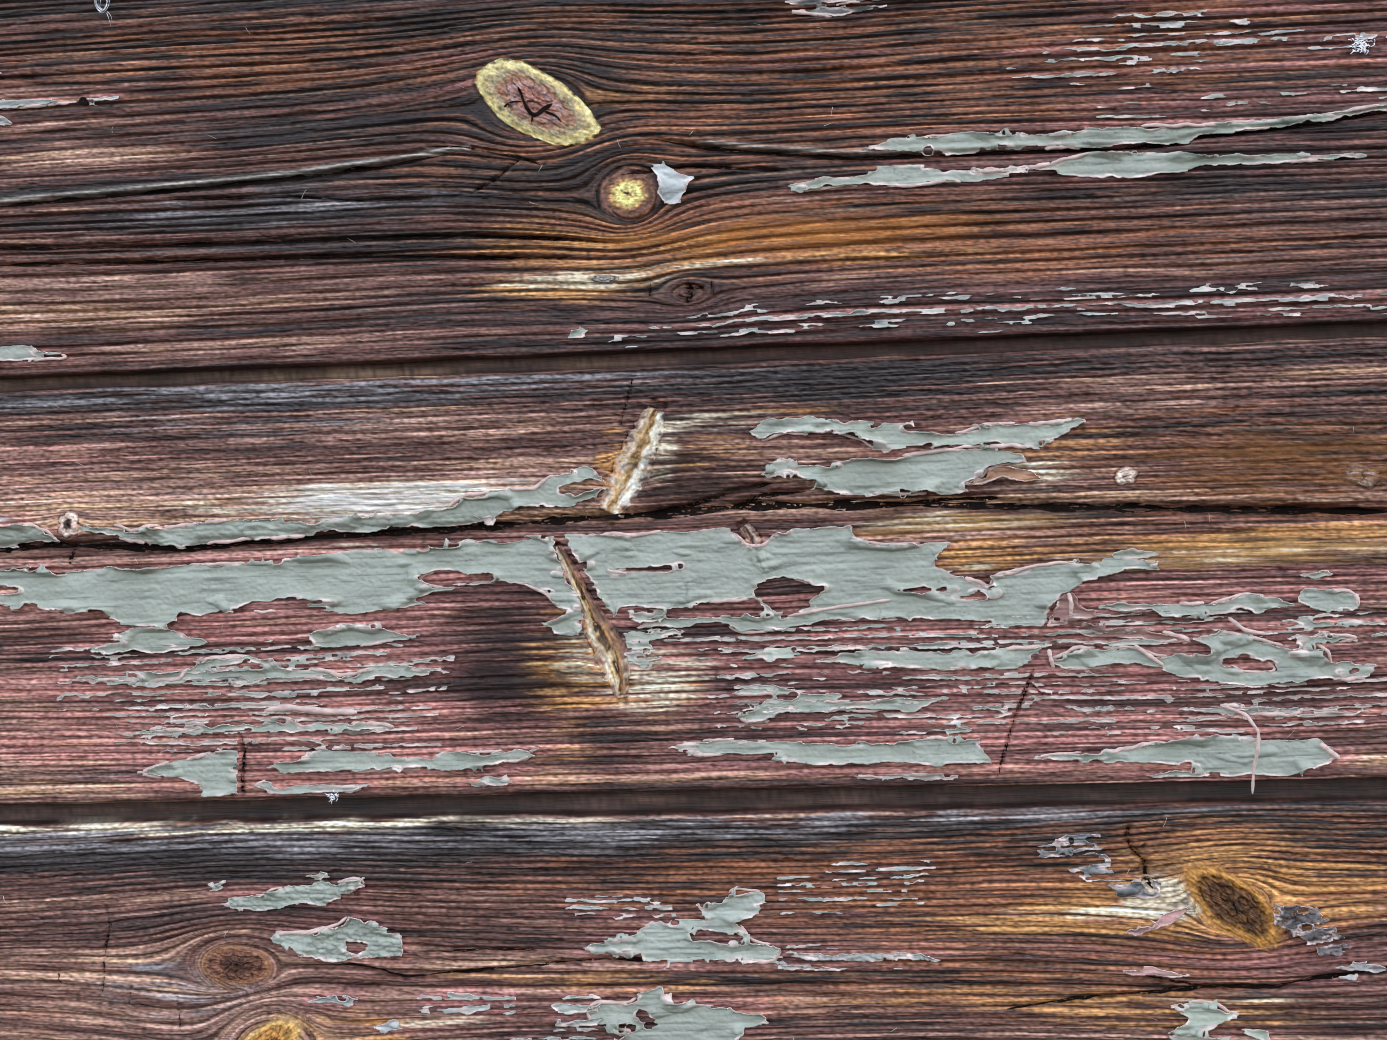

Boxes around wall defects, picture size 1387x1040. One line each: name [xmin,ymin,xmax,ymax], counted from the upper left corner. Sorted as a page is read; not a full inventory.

peeling [785,0,887,18]
peeling [0,96,119,126]
peeling [788,10,1387,193]
peeling [750,416,1086,498]
peeling [0,466,1387,797]
peeling [208,871,365,911]
peeling [1037,834,1161,899]
peeling [270,917,403,963]
peeling [511,860,940,1040]